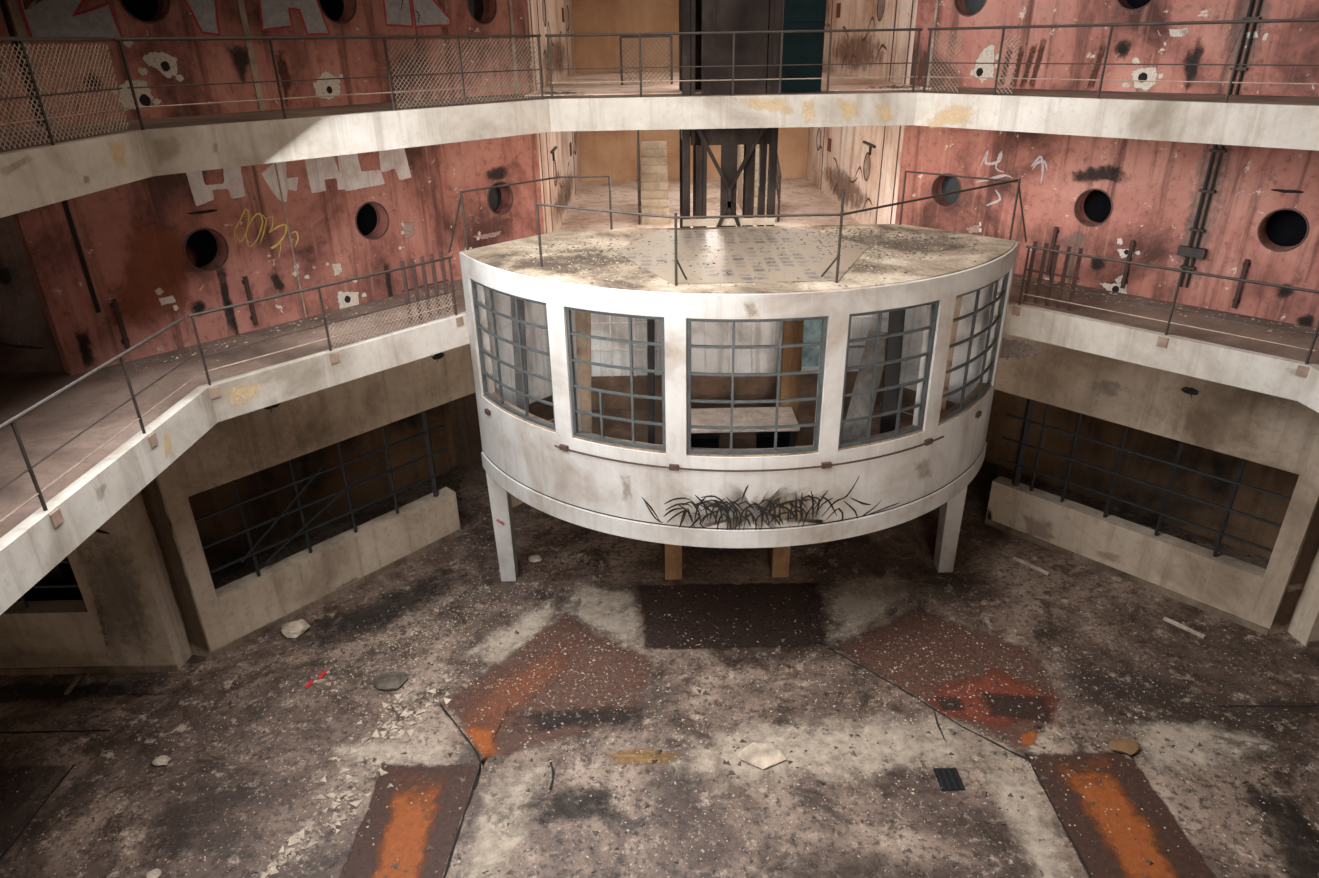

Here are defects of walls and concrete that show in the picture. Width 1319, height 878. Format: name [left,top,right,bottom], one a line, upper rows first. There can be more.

rust [339,764,478,878]
rust [1027,752,1215,878]